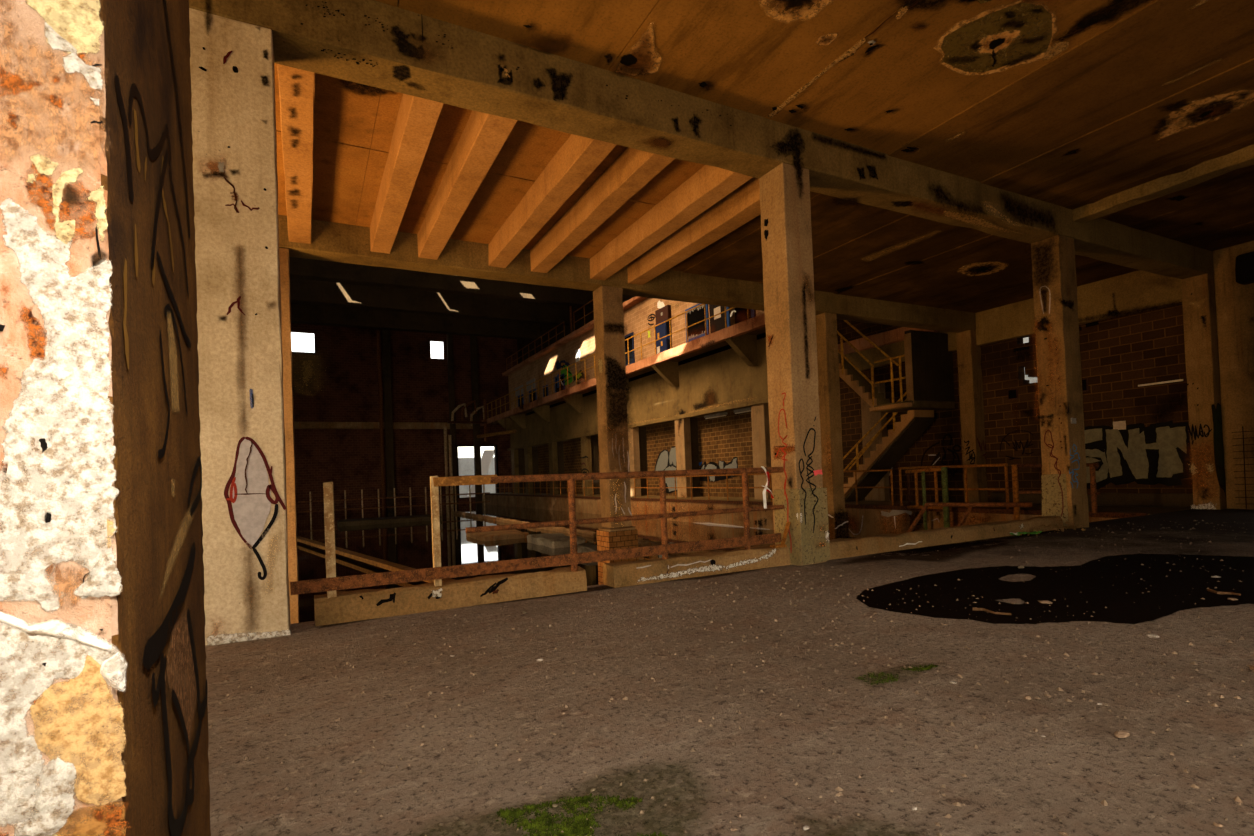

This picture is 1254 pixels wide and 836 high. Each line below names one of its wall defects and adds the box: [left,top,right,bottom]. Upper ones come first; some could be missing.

peeling [26,0,104,105]
water stain [935,0,1057,75]
flaking render [0,198,122,611]
flaking render [0,622,127,836]